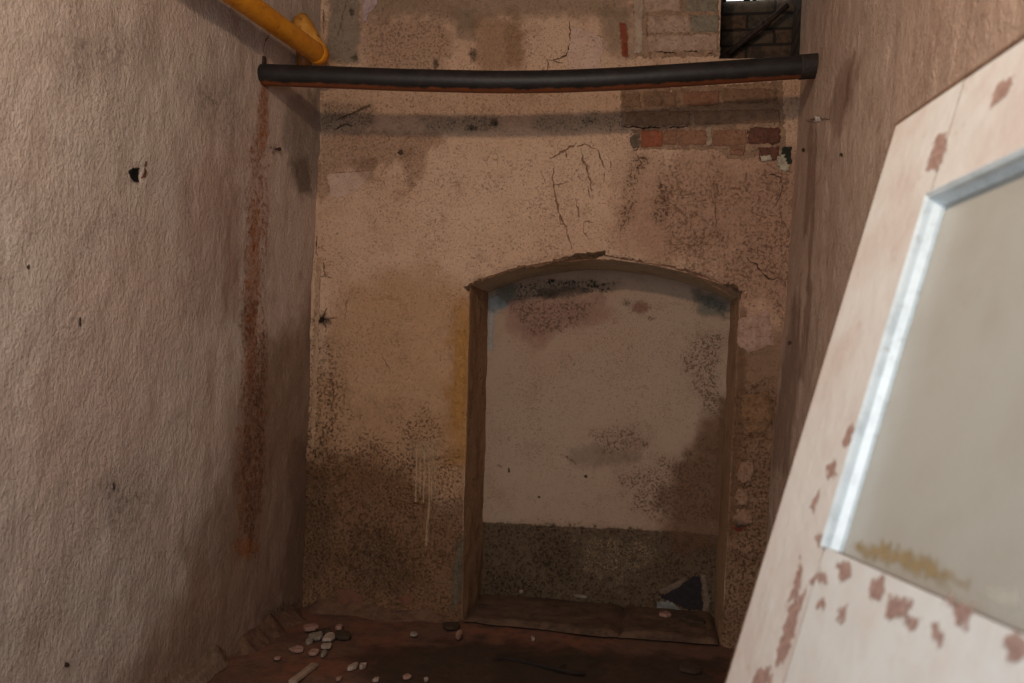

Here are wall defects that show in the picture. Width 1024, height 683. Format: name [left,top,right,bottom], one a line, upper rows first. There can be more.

crack [547,22,571,70]
crack [541,143,612,249]
flaking render [620,81,805,226]
rust [234,86,276,558]
water stain [489,279,615,350]
water stain [182,313,469,666]
water stain [481,346,781,649]